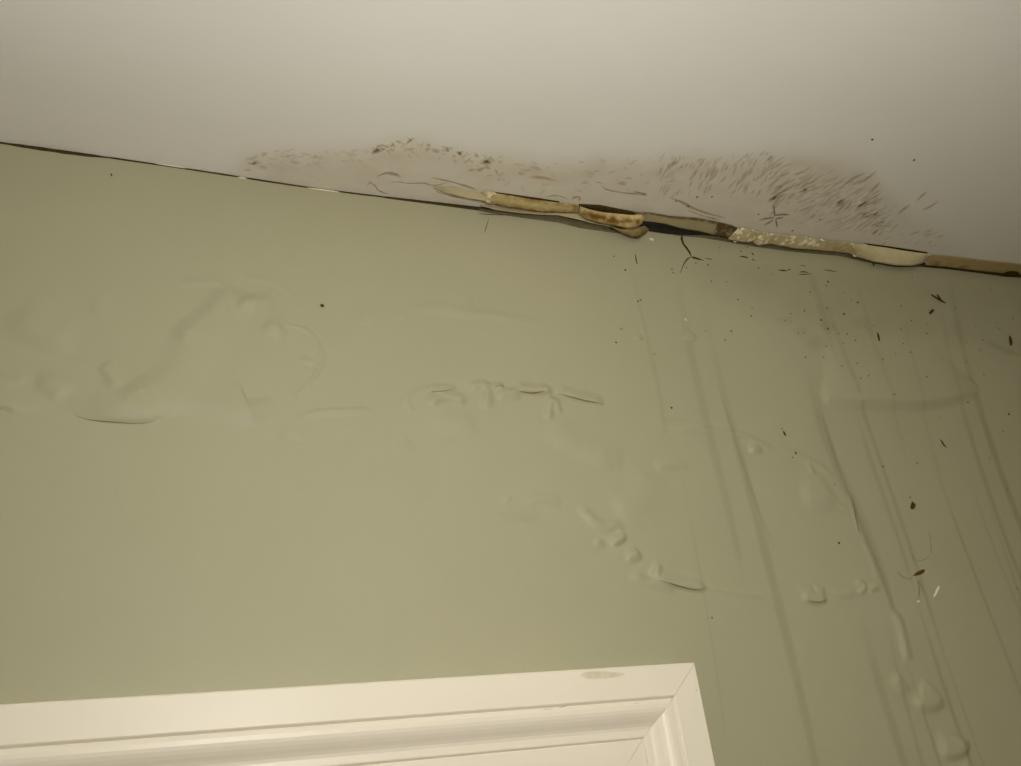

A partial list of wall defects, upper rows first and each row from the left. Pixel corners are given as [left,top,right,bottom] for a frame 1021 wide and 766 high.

peeling [850,243,932,266]